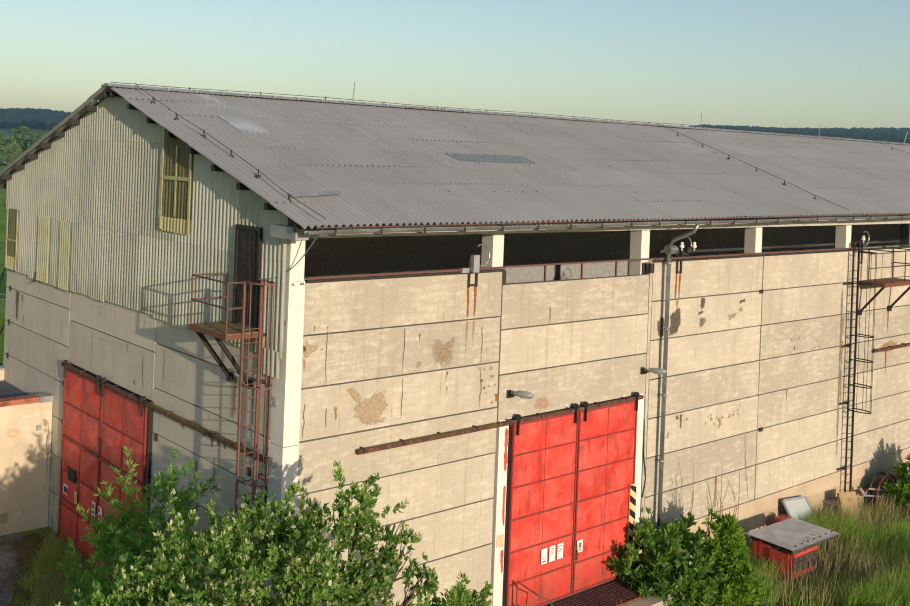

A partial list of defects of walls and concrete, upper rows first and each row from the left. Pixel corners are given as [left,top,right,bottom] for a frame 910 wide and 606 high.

corrosion [466,287,477,339]
damp [658,308,681,337]
peeling [433,338,454,364]
peeling [347,388,387,424]